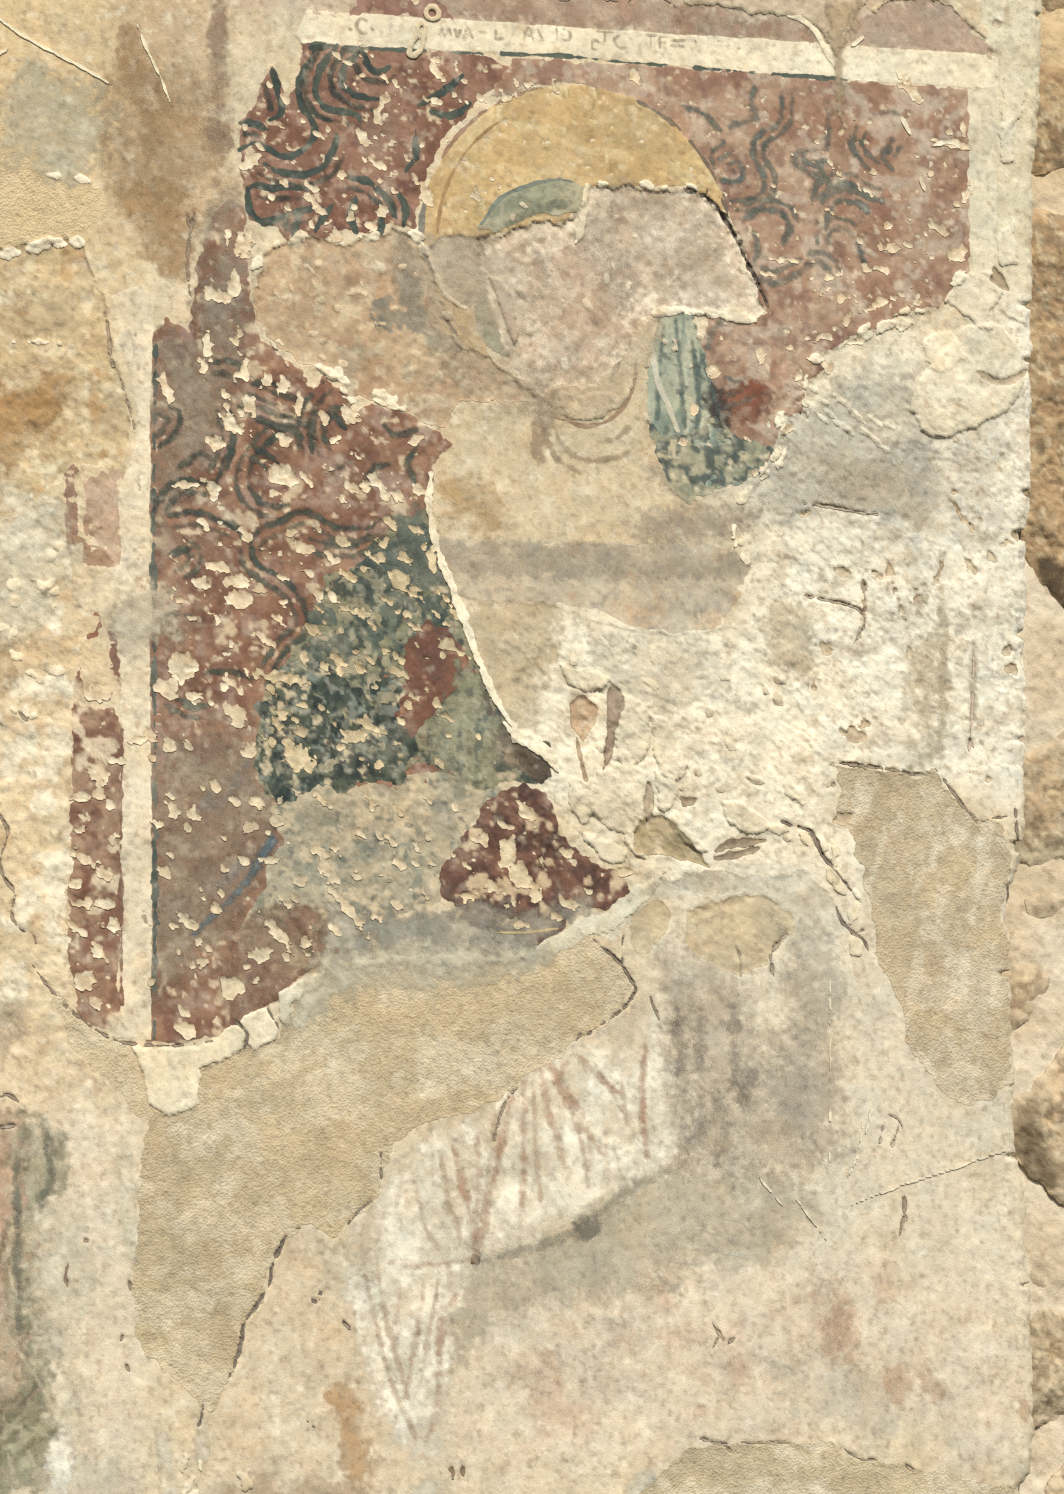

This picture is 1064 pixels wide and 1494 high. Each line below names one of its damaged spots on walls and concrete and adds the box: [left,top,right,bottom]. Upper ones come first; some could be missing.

spalling [150,40,1030,1000]
crack [780,820,869,950]
flaking render [132,974,322,1116]
crack [347,1152,383,1224]
crack [228,1235,287,1377]
flaking render [181,1454,202,1494]